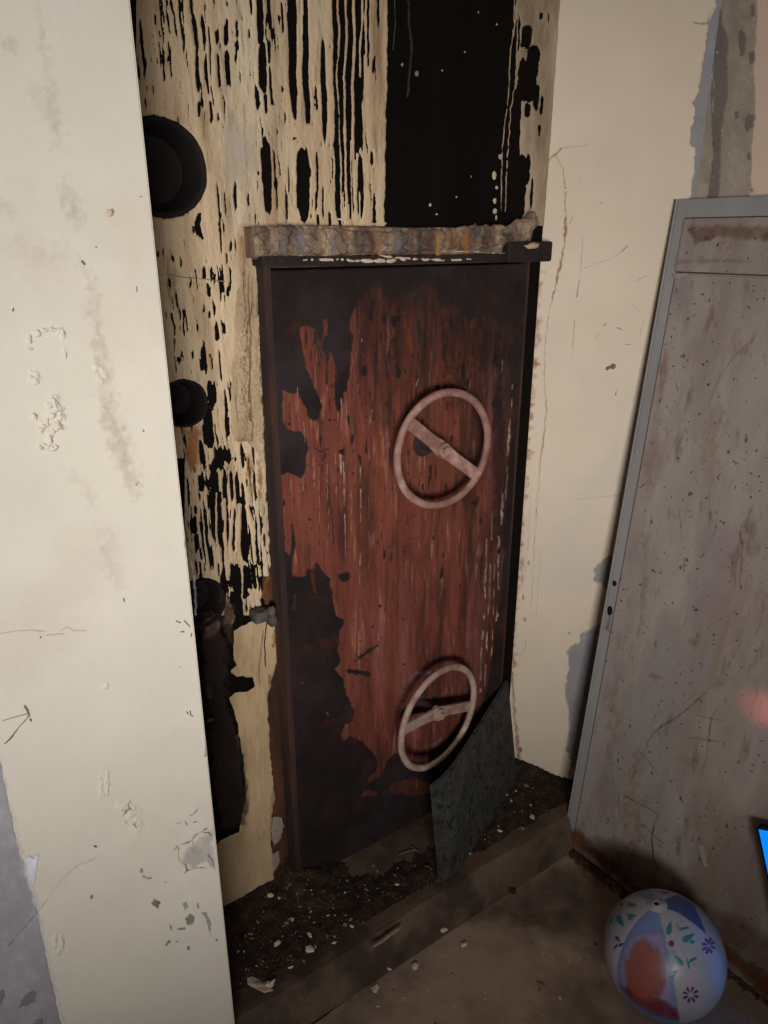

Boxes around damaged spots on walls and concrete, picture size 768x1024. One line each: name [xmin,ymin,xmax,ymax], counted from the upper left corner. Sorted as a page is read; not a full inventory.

peeling [154,0,560,458]
flaking render [695,0,757,199]
flaking render [0,764,61,1024]
peeling [177,613,284,907]
rust [258,621,276,686]
peeling [281,308,494,795]